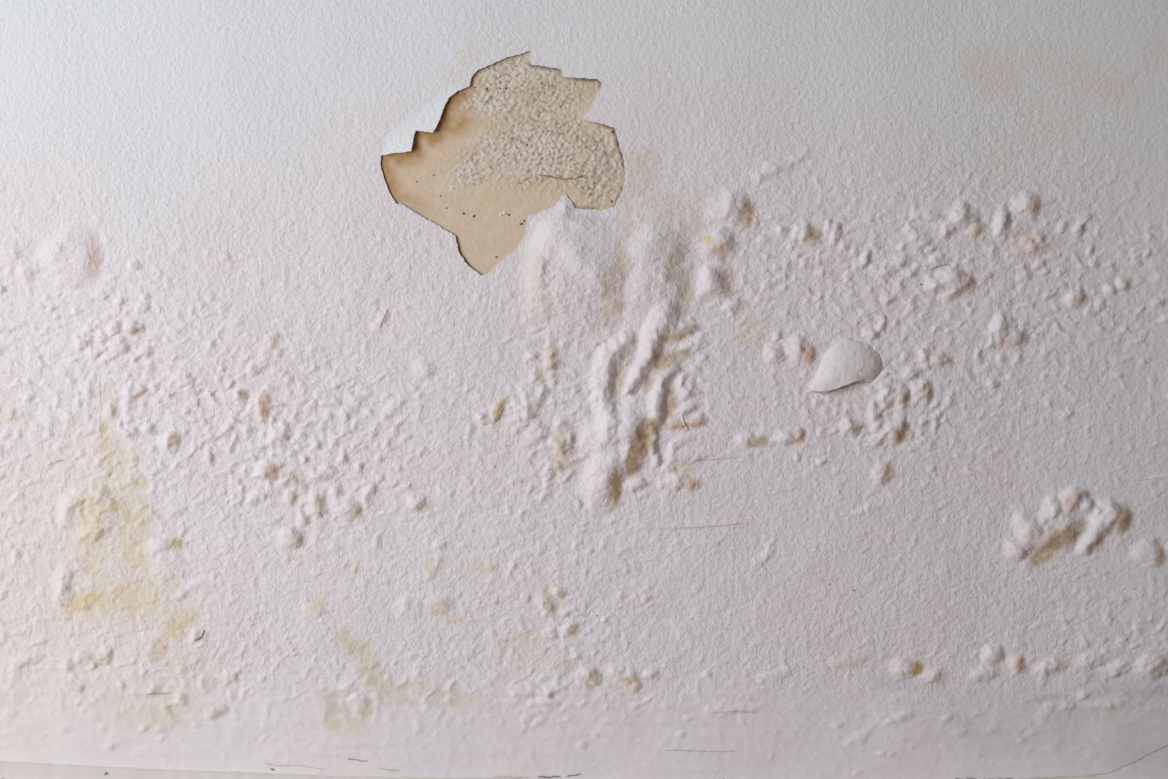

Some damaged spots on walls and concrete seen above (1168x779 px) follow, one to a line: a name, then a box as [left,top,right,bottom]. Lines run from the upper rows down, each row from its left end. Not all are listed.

peeling [380,51,625,275]